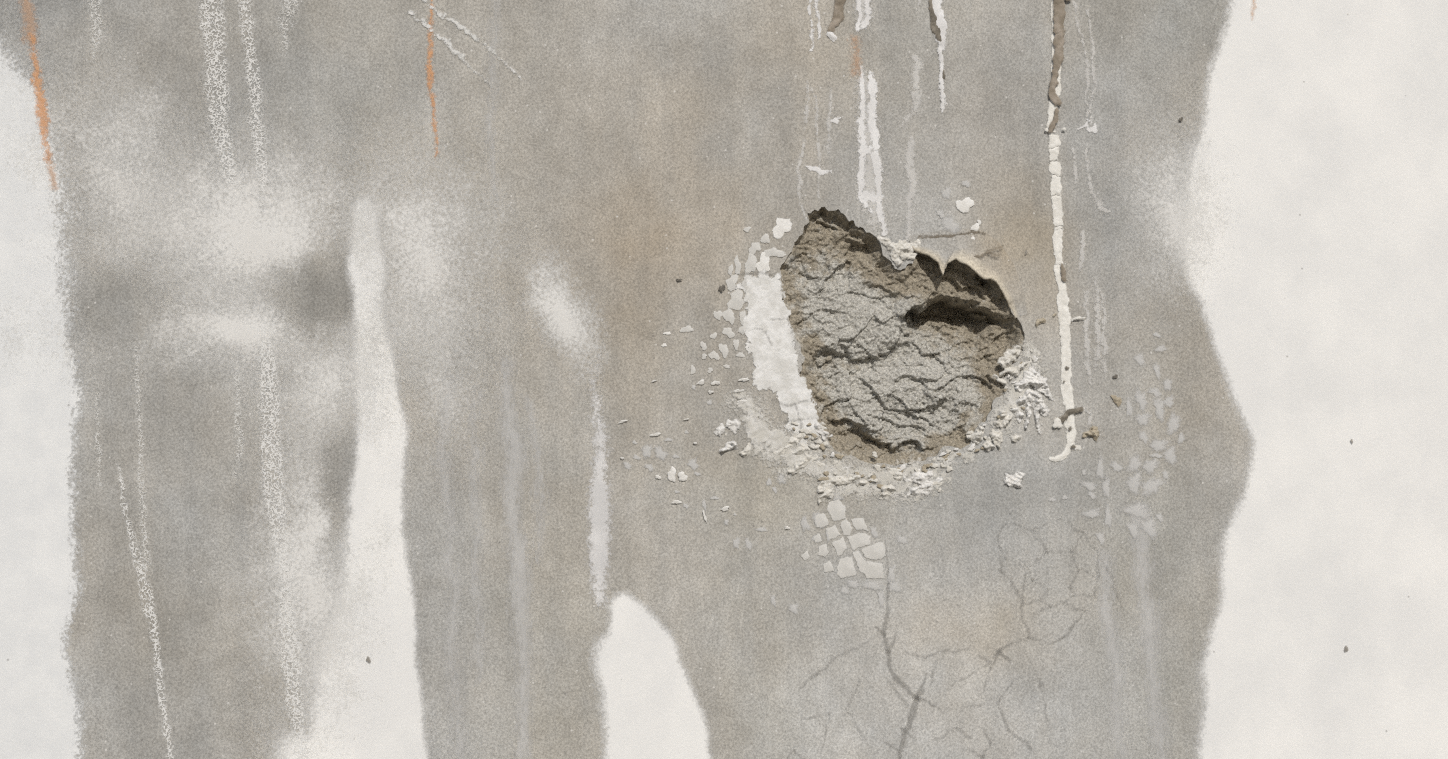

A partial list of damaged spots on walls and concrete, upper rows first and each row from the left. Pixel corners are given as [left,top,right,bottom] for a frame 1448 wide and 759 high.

rust [31,37,49,159]
water stain [198,0,269,205]
rust [426,0,438,152]
water stain [796,66,888,236]
spalling [661,207,1024,466]
water stain [901,0,947,241]
peeling [937,181,981,240]
water stain [1045,0,1111,462]
water stain [95,345,174,759]
water stain [233,332,308,759]
water stain [585,354,613,606]
peeling [620,418,766,550]